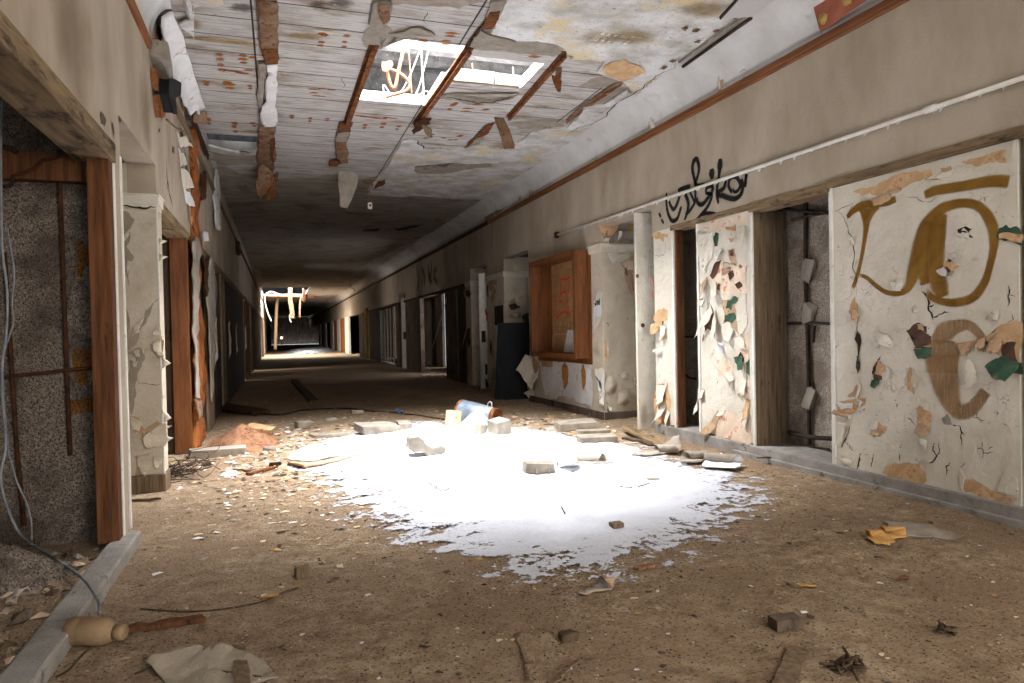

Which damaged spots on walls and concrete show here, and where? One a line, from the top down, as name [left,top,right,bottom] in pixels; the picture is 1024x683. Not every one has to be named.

spalling [361,25,435,50]
spalling [470,28,564,57]
spalling [443,93,518,105]
spalling [414,163,492,174]
peeling [584,188,700,296]
peeling [126,210,173,477]
peeling [650,308,668,352]
peeling [693,214,752,444]
peeling [832,297,890,448]
peeling [895,323,952,437]
peeling [956,320,1023,381]
crack [930,415,1006,474]